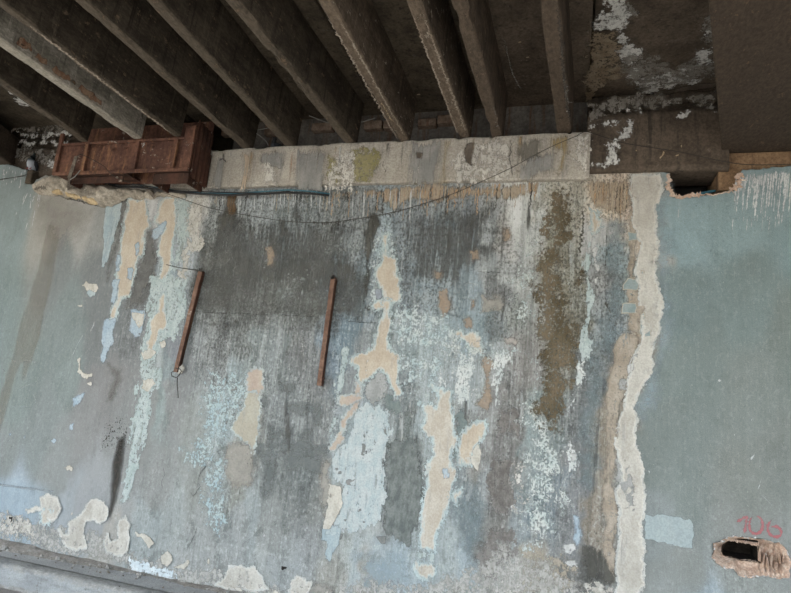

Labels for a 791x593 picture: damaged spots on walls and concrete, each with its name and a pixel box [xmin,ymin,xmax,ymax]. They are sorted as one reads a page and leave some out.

water stain [444,0,716,187]
flaking render [0,493,109,552]
water stain [110,438,124,513]
peeling [32,176,205,504]
water stain [0,512,283,593]
water stain [130,230,158,307]
flaking render [178,365,265,538]
water stain [200,144,388,306]
peeling [319,210,489,587]
water stain [338,188,624,593]
flaking render [584,173,745,593]
spalling [712,535,791,579]